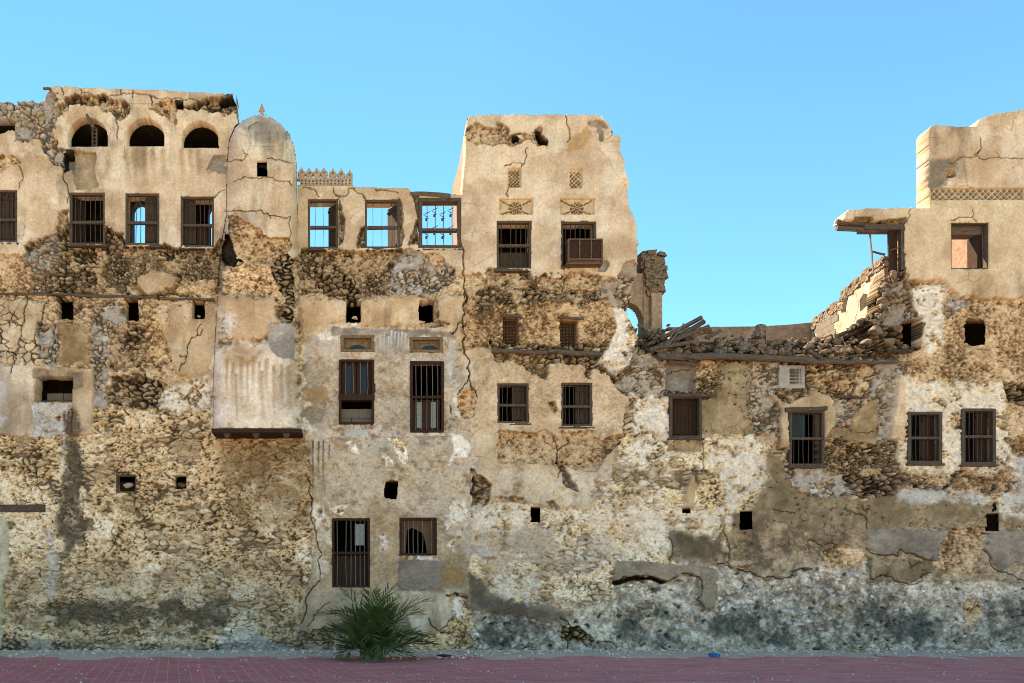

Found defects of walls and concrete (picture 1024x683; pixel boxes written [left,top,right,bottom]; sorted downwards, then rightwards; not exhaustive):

spalling [463,122,548,147]
crack [948,137,1024,164]
crack [0,296,56,373]
crack [179,327,203,371]
spalling [0,197,460,410]
crack [450,244,478,413]
spalling [464,260,637,380]
spalling [784,357,1016,498]
spalling [1002,381,1024,407]
crack [300,478,330,626]
spalling [445,434,527,552]
crack [844,506,932,586]